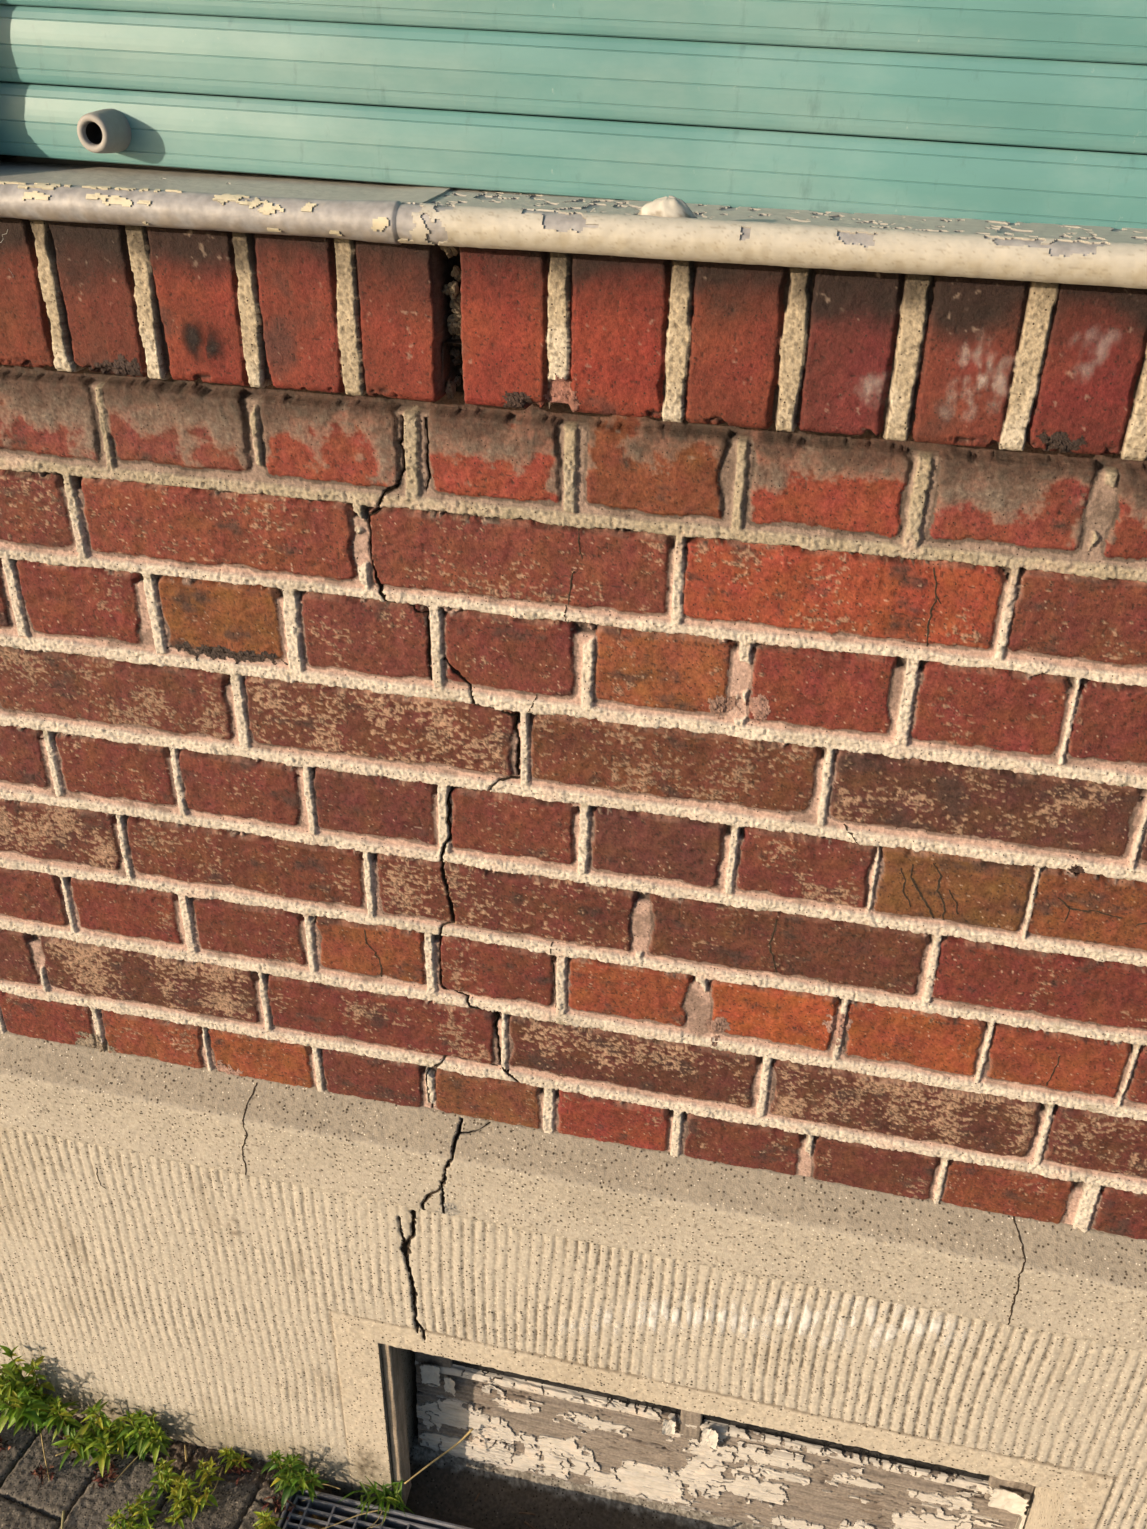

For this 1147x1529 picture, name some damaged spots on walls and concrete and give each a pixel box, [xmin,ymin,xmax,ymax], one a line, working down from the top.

peeling [0,161,1147,289]
crack [369,416,537,1341]
crack [214,1061,257,1175]
crack [1007,1216,1026,1325]
peeling [415,1360,1030,1529]